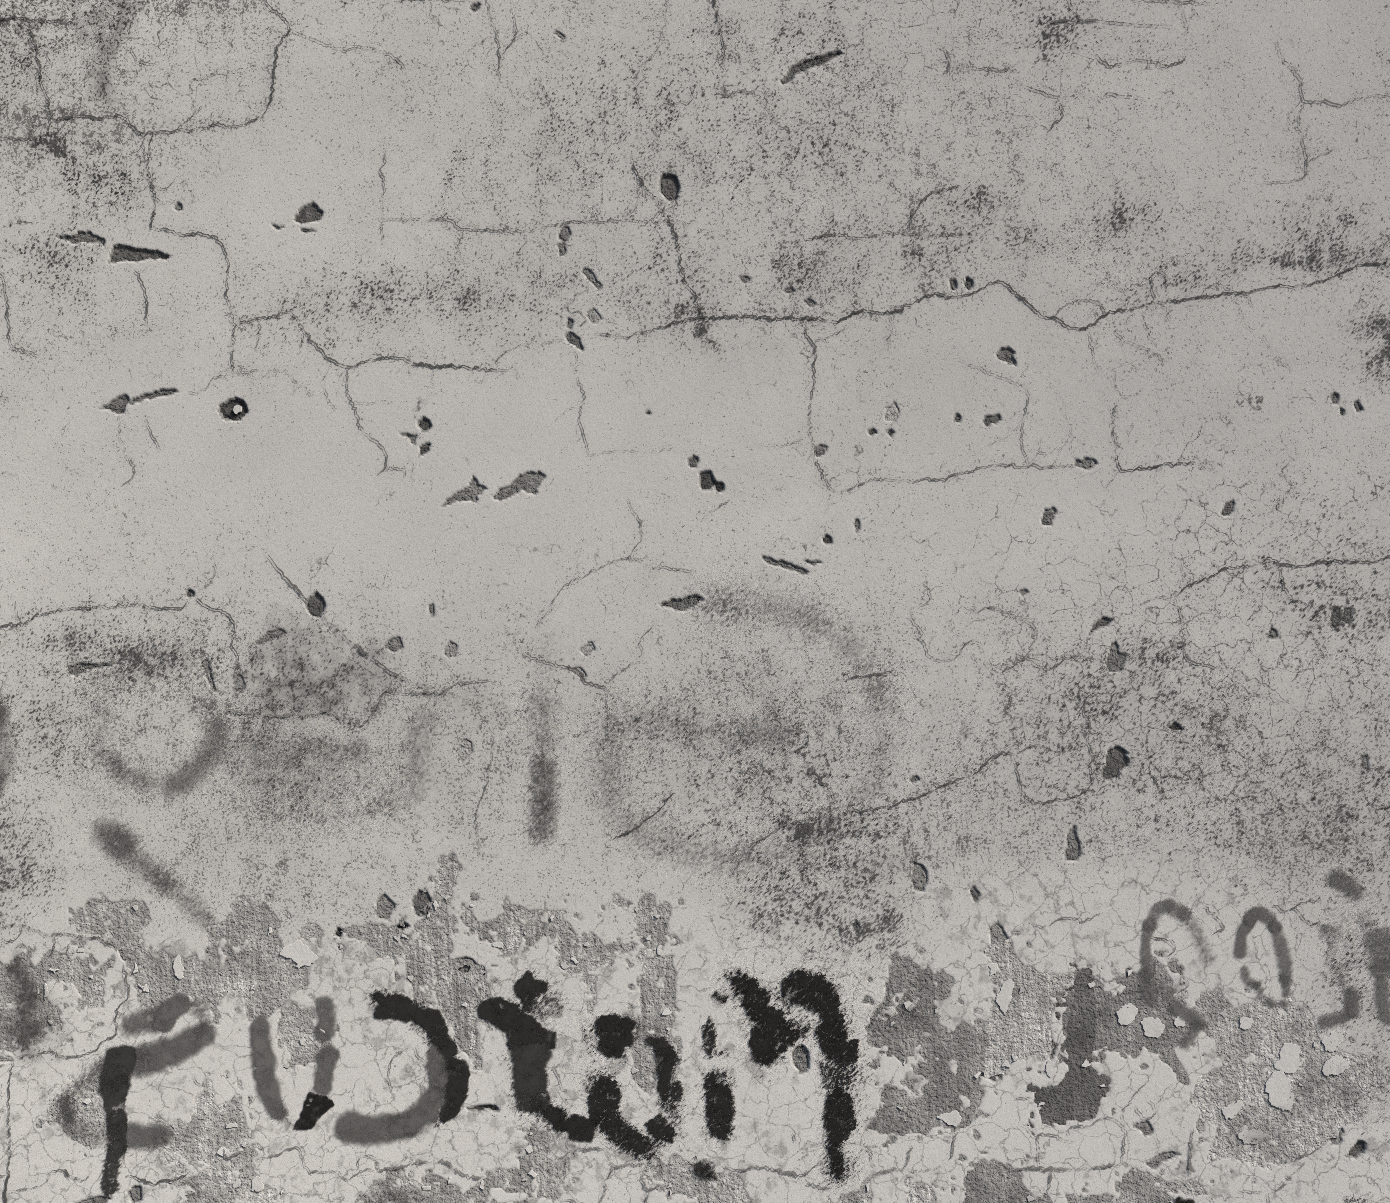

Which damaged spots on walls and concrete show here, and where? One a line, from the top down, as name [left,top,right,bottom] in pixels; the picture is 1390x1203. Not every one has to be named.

spalling [61,233,168,262]
crack [0,0,1390,492]
spalling [445,473,545,505]
crack [0,564,489,726]
crack [1141,549,1390,669]
peeling [0,853,683,1094]
crack [0,924,130,1203]
peeling [863,924,1390,1203]
peeling [152,1071,284,1203]
crack [126,1136,483,1202]
peeling [355,1124,580,1203]
crack [1015,1081,1350,1203]